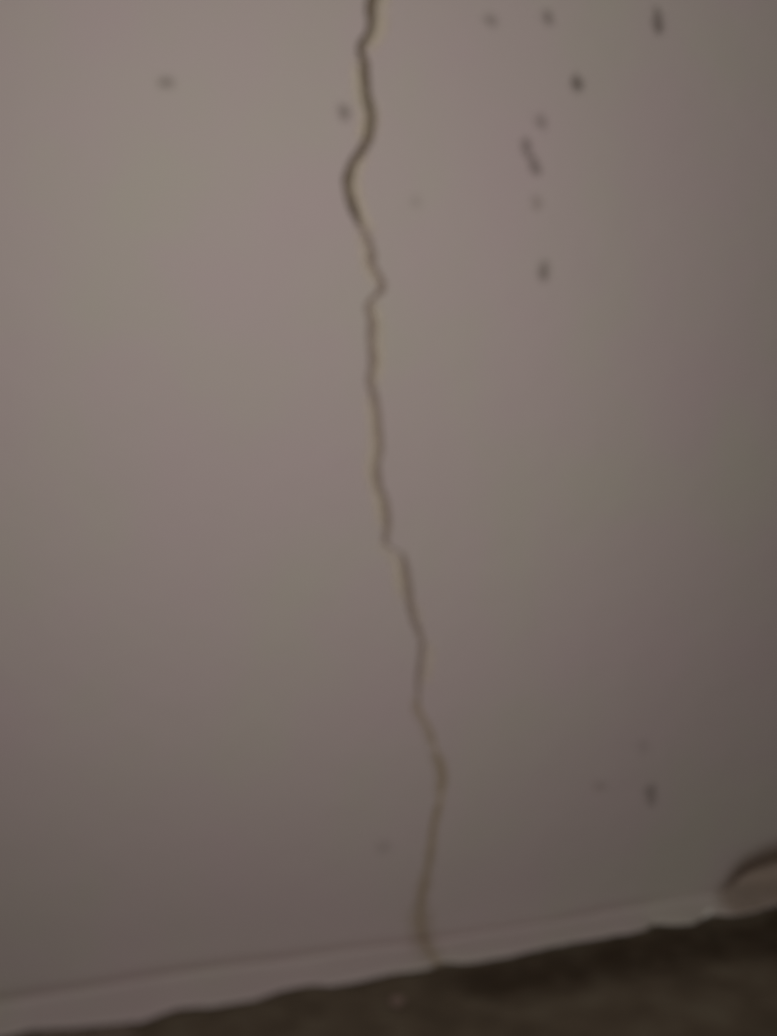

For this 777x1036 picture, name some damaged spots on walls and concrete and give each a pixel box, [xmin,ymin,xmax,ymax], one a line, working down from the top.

crack [342,0,446,966]